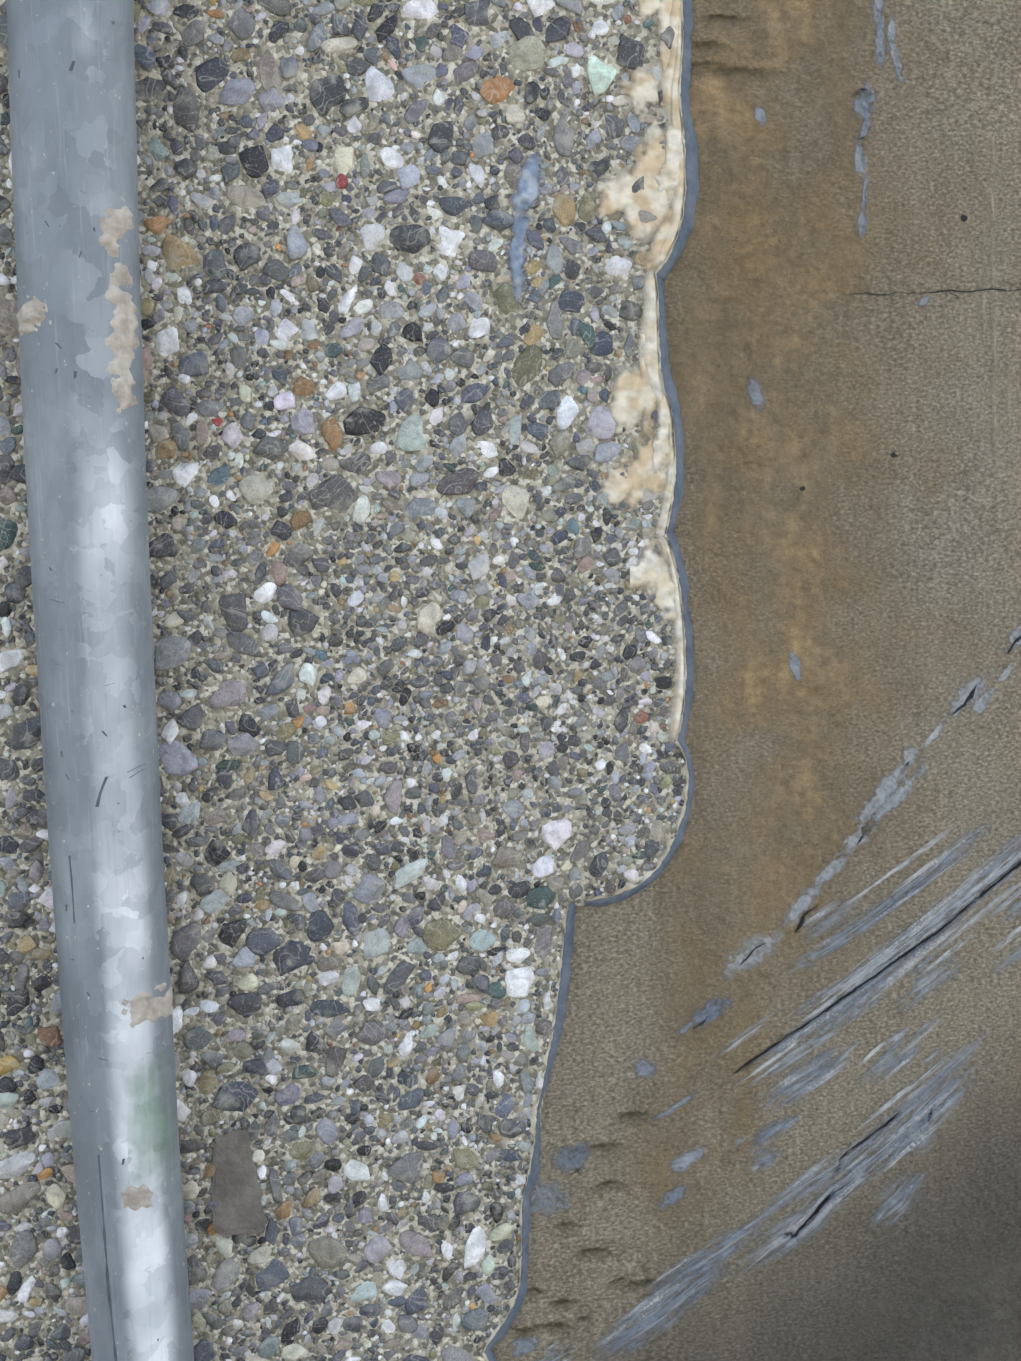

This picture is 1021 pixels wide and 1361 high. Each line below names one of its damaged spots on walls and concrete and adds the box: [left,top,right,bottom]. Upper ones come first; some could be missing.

peeling [872,0,904,82]
peeling [854,84,876,237]
crack [735,861,1021,1073]
crack [784,1110,932,1242]